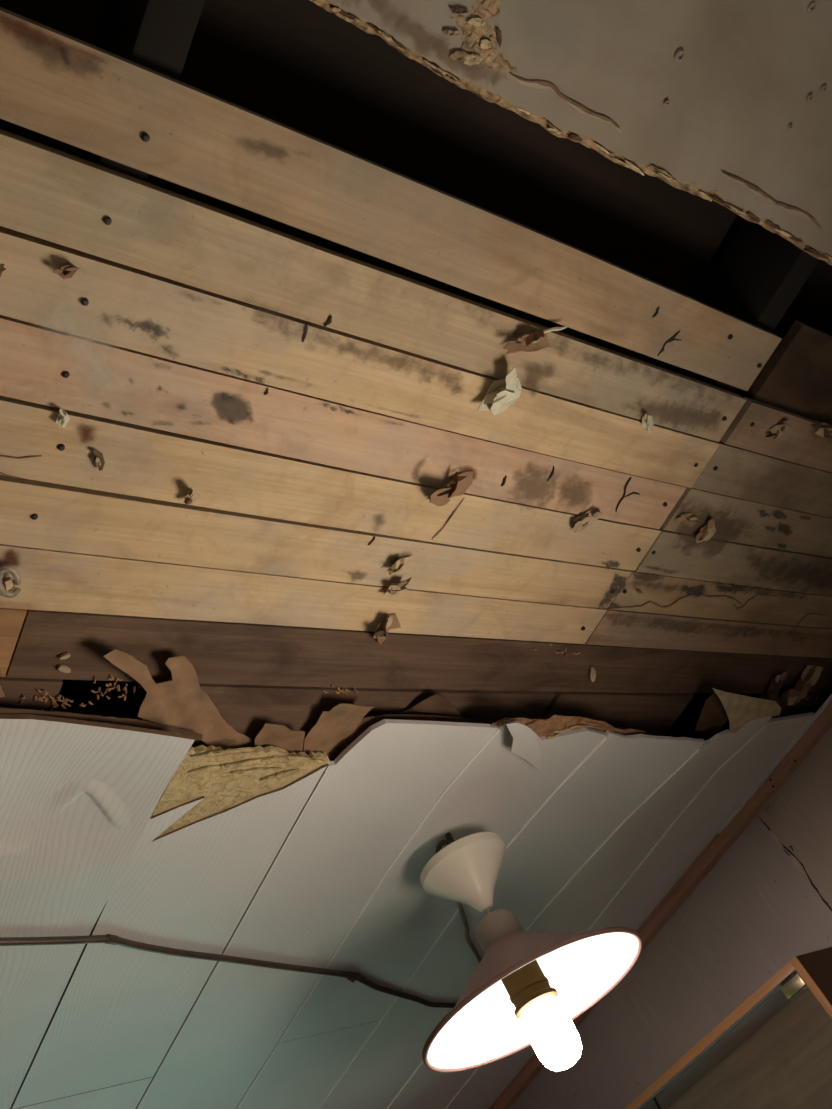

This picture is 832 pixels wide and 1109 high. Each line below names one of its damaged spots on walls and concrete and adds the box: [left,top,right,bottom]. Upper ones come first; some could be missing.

crack [509,72,622,134]
spalling [310,0,832,266]
crack [721,172,823,232]
water stain [215,393,252,424]
crack [616,477,640,512]
peeling [695,688,781,735]
peeling [190,747,325,782]
peeling [506,722,543,773]
crack [757,815,832,911]